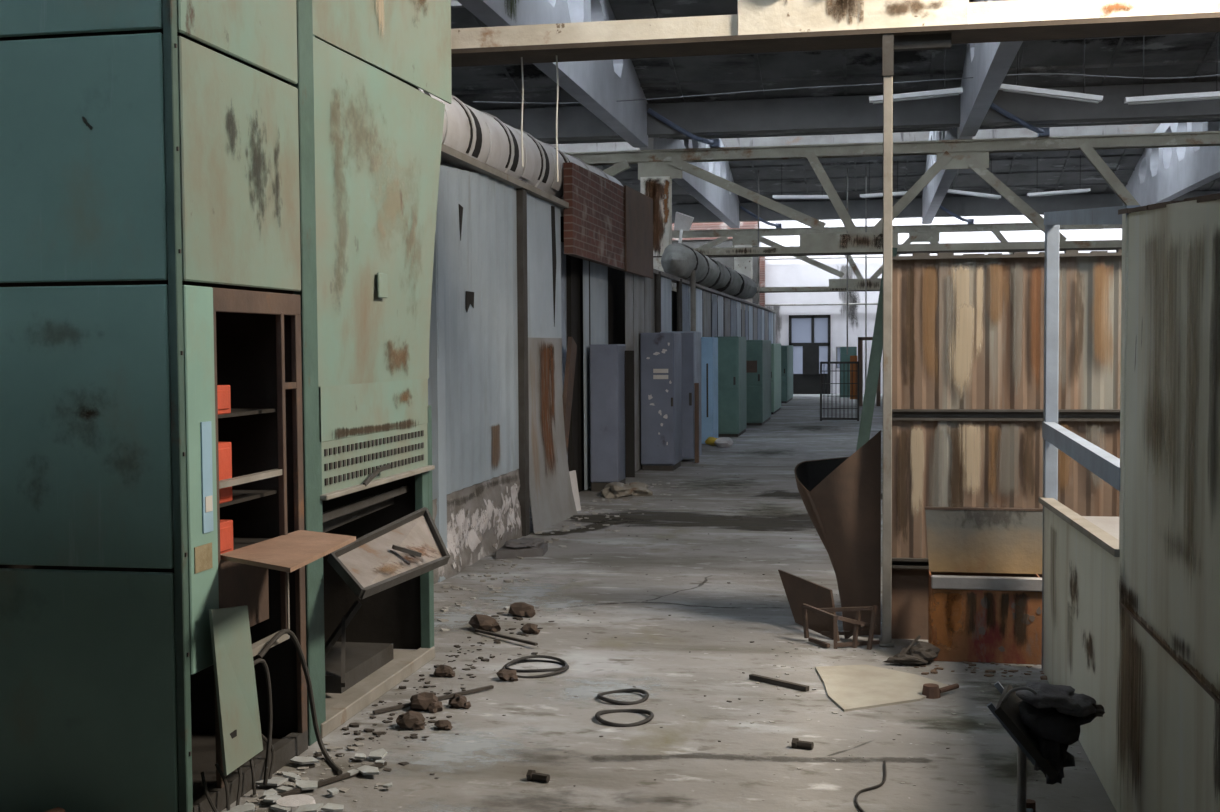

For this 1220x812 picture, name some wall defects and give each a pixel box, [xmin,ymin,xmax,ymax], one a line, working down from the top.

corrosion [827,0,864,23]
corrosion [887,0,941,14]
corrosion [1118,193,1220,215]
corrosion [906,267,955,385]
corrosion [976,264,1042,388]
corrosion [1058,264,1113,382]
flaking render [447,477,521,572]
corrosion [541,343,556,473]
corrosion [897,426,967,539]
corrosion [988,425,1035,495]
corrosion [1087,426,1103,449]
corrosion [1117,569,1220,795]